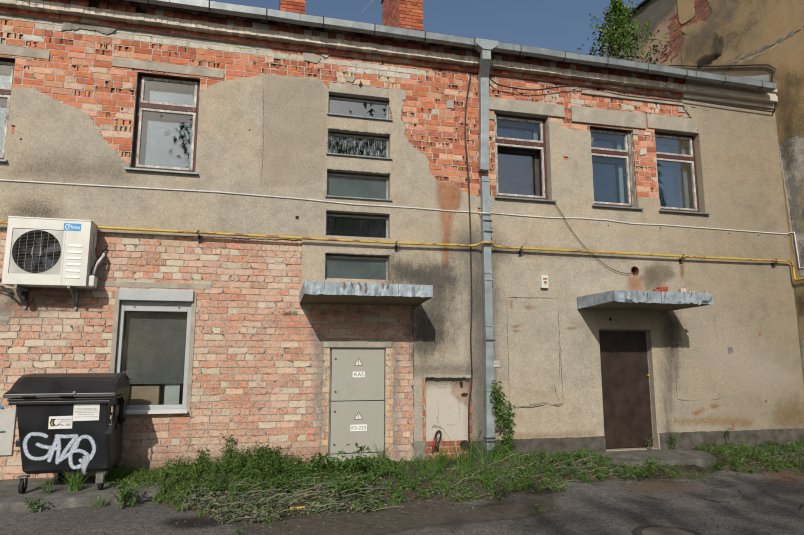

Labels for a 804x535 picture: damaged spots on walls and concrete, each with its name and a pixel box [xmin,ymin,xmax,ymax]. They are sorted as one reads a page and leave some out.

peeling [659,0,712,64]
crack [728,26,804,70]
peeling [0,14,496,197]
peeling [489,75,689,204]
corrosion [437,182,461,268]
water stain [391,263,457,356]
water stain [425,231,499,441]
crack [509,312,563,409]
spalling [413,374,473,460]